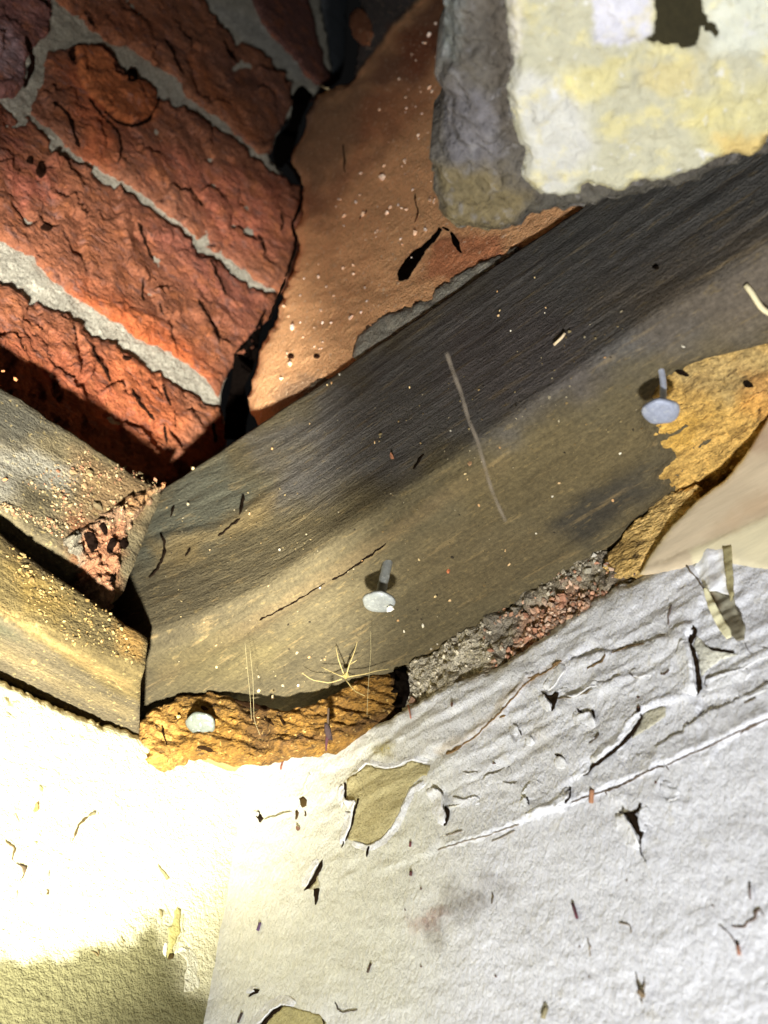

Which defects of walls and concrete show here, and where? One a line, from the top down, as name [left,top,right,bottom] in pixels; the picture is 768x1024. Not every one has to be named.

crack [198,86,313,443]
spalling [402,551,637,712]
peeling [630,666,655,679]
crack [438,824,519,851]
peeling [337,706,666,863]
crack [571,719,768,803]